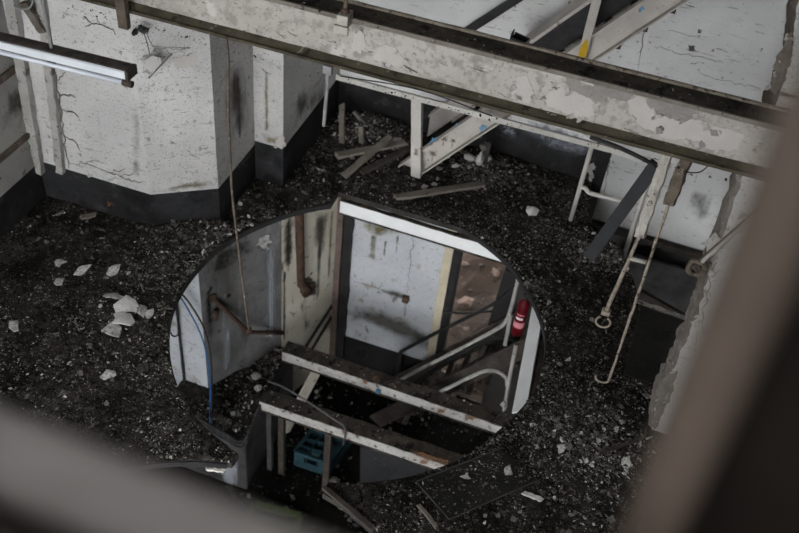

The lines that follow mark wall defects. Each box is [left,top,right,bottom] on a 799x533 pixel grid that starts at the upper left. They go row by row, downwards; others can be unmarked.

spalling [765,31,795,95]
crack [55,72,146,183]
water stain [229,72,243,134]
peeling [510,75,744,152]